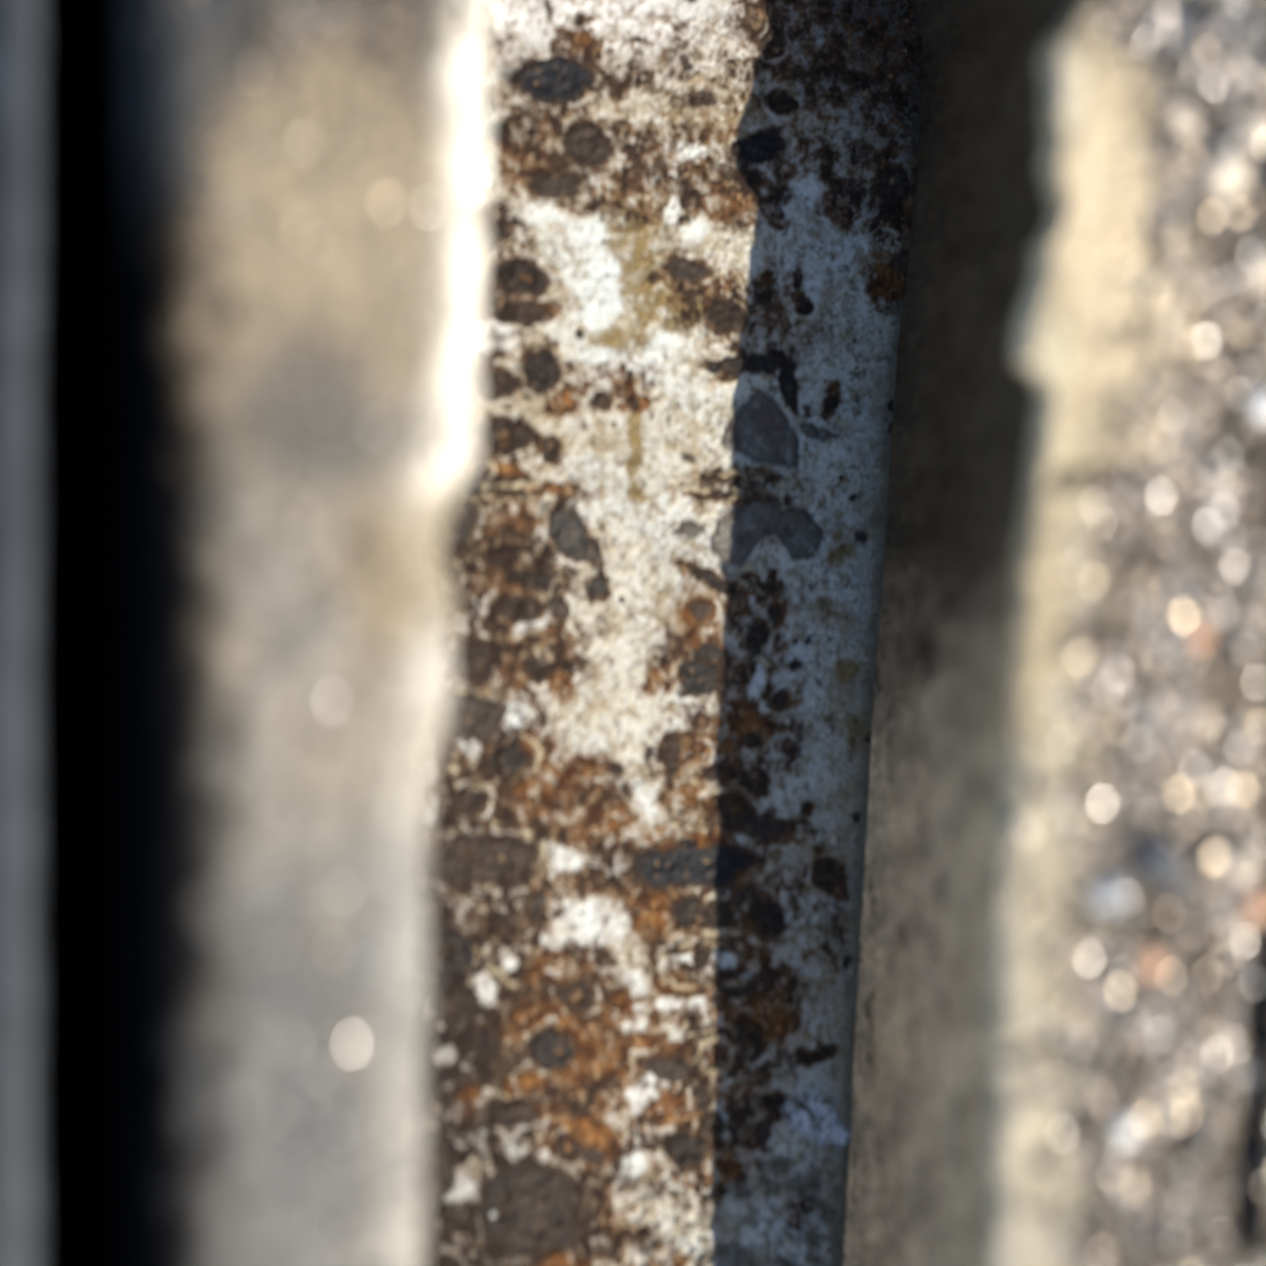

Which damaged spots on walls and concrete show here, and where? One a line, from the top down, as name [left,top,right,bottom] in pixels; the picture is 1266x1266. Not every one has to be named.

rust [420,0,922,1266]